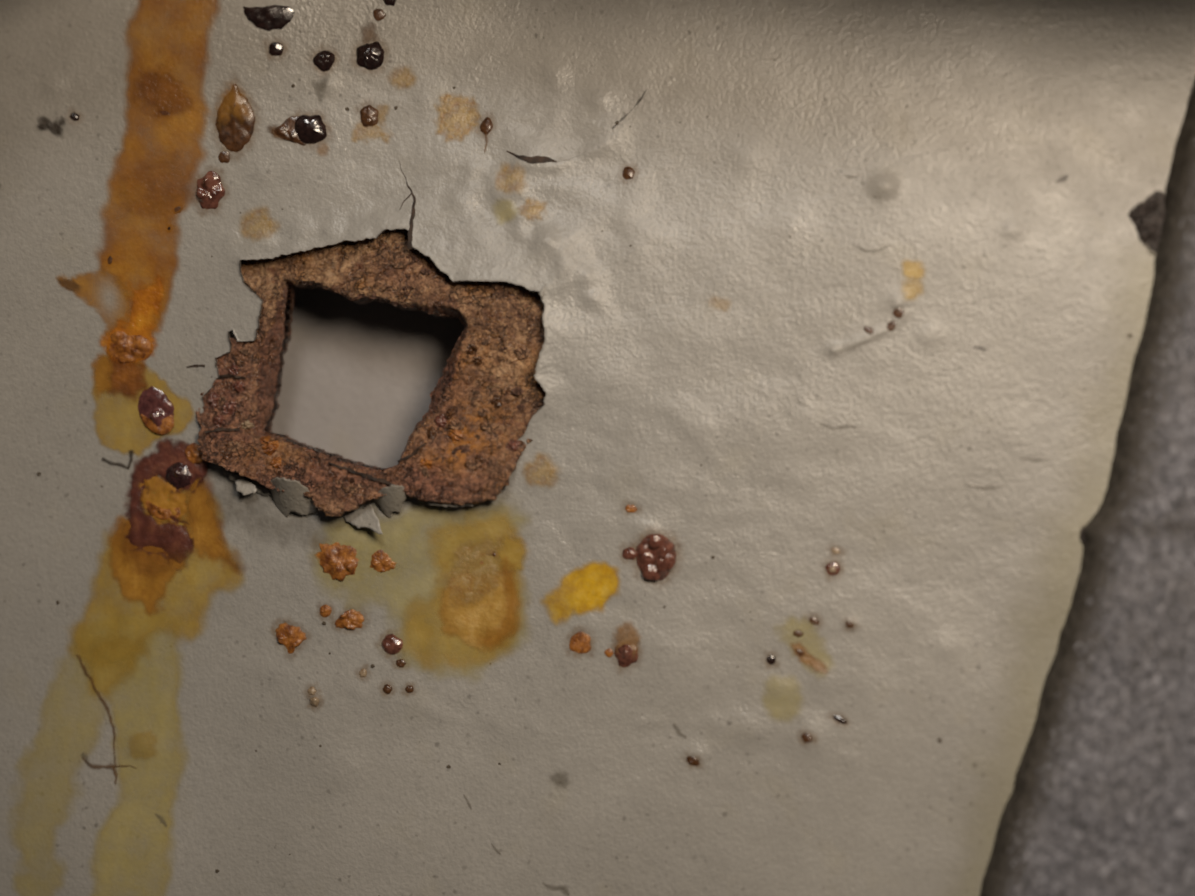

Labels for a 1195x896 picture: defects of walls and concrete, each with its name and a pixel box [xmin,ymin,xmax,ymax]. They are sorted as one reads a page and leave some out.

crack [399,161,416,249]
rust [903,261,924,298]
rust [59,0,556,896]
rust [546,534,677,622]
rust [825,562,840,576]
rust [788,620,829,673]